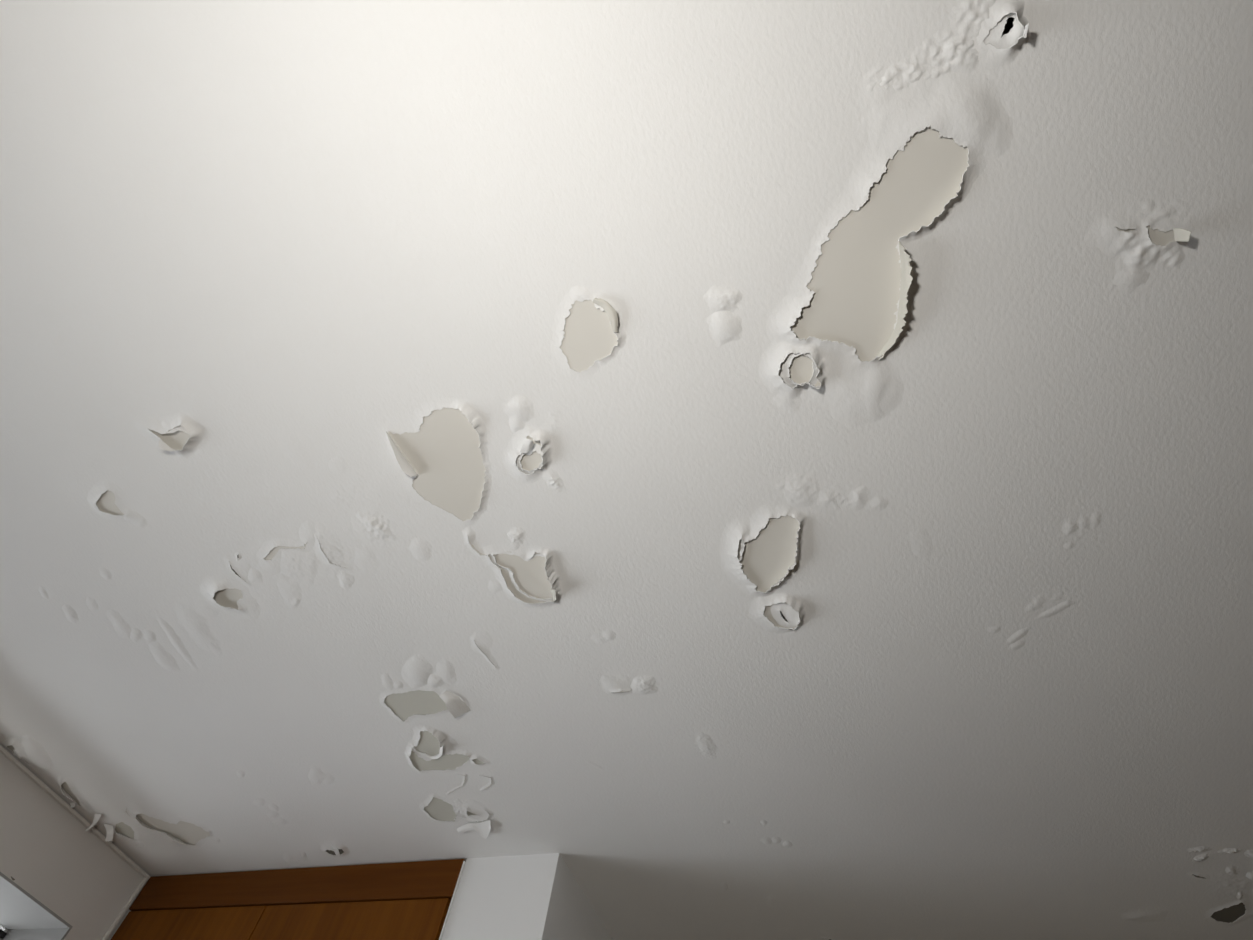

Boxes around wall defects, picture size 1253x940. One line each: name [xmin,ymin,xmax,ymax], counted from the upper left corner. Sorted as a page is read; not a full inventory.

peeling [758,0,1037,429]
peeling [549,285,627,381]
peeling [134,411,205,459]
peeling [87,480,152,530]
peeling [378,397,564,609]
peeling [193,575,261,622]
peeling [720,503,807,634]
peeling [1,734,221,847]
peeling [378,685,495,839]
peeling [1204,899,1253,926]